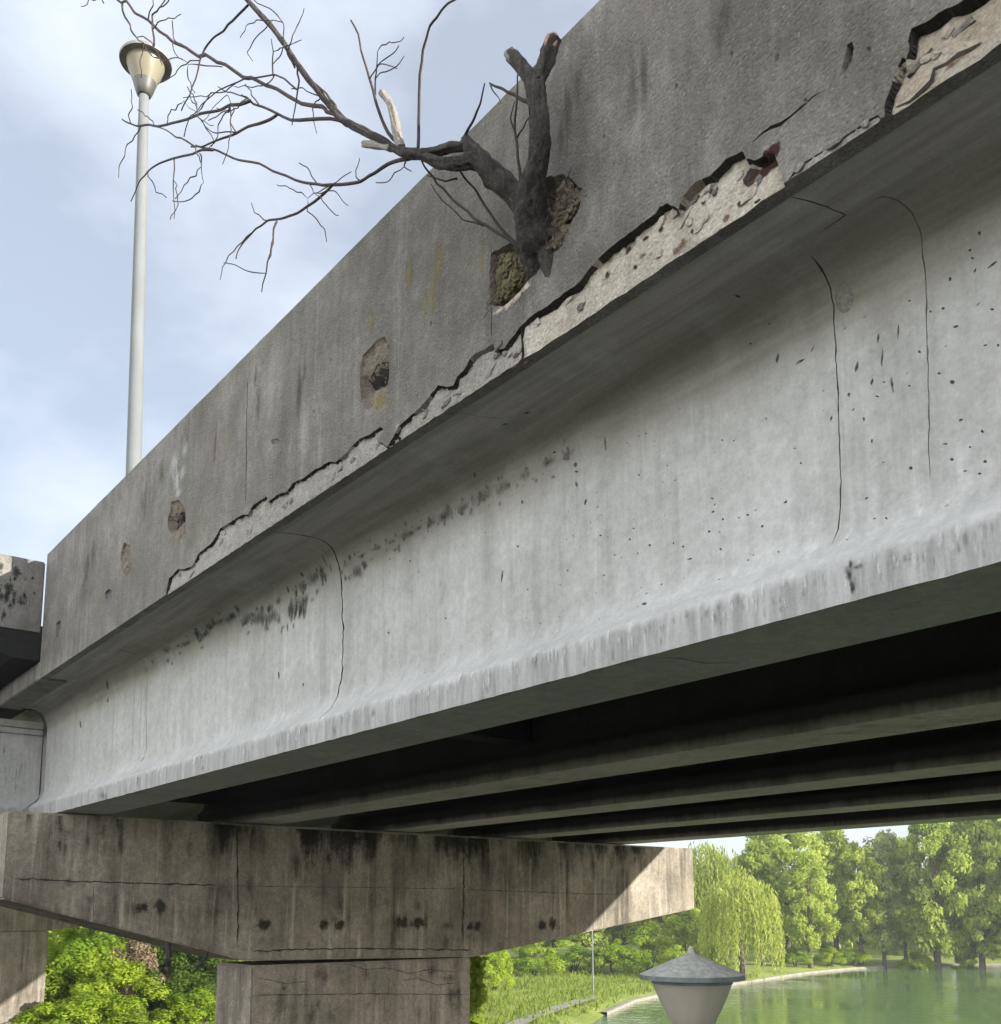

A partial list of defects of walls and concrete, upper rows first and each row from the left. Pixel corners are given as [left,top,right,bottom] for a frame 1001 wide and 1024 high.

corrosion [744,142,779,184]
crack [752,92,821,143]
spalling [166,0,1001,595]
crack [867,196,930,469]
crack [811,256,842,542]
leakage [163,553,365,664]
crack [277,532,344,716]
leakage [137,899,166,916]
crack [18,827,616,952]
leakage [394,917,424,929]